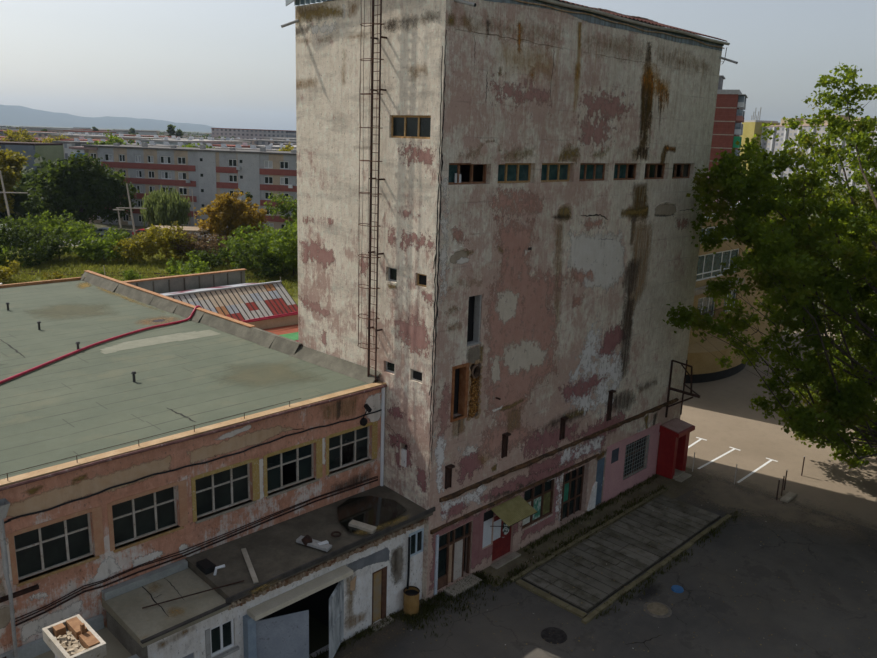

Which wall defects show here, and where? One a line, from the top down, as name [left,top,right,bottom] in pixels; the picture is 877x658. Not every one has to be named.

peeling [490,68,555,119]
peeling [578,87,634,153]
rust [633,47,669,158]
peeling [397,141,437,167]
peeling [300,239,334,269]
leakage [621,222,652,375]
peeling [365,178,633,590]